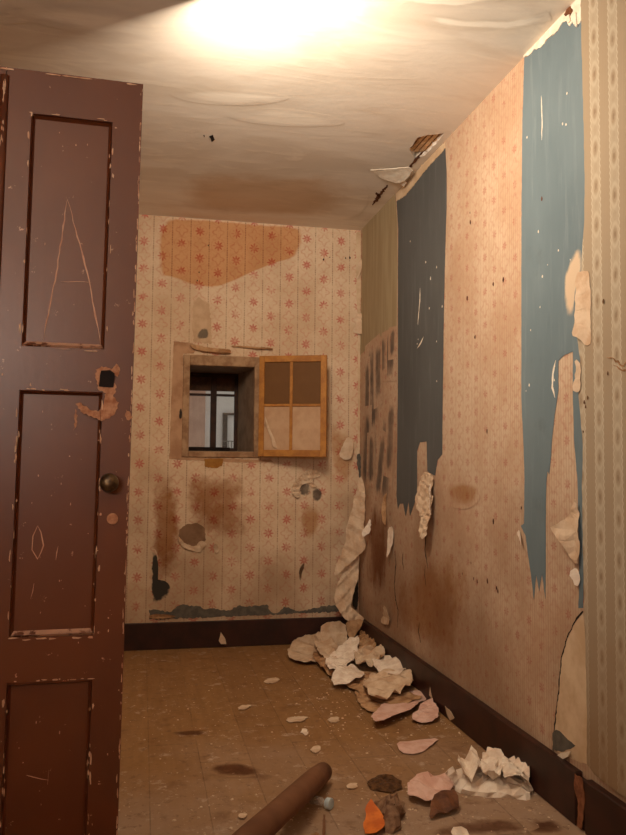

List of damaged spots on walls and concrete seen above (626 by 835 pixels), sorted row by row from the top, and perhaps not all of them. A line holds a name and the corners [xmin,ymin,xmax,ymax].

peeling [6,7,157,38]
peeling [170,89,344,127]
damp [155,165,369,289]
peeling [371,134,447,516]
peeling [74,364,133,443]
peeling [390,0,587,764]
peeling [178,523,219,553]
damp [150,466,255,605]
damp [299,484,323,542]
damp [327,325,481,667]
peeling [149,604,339,620]
peeling [574,773,585,830]